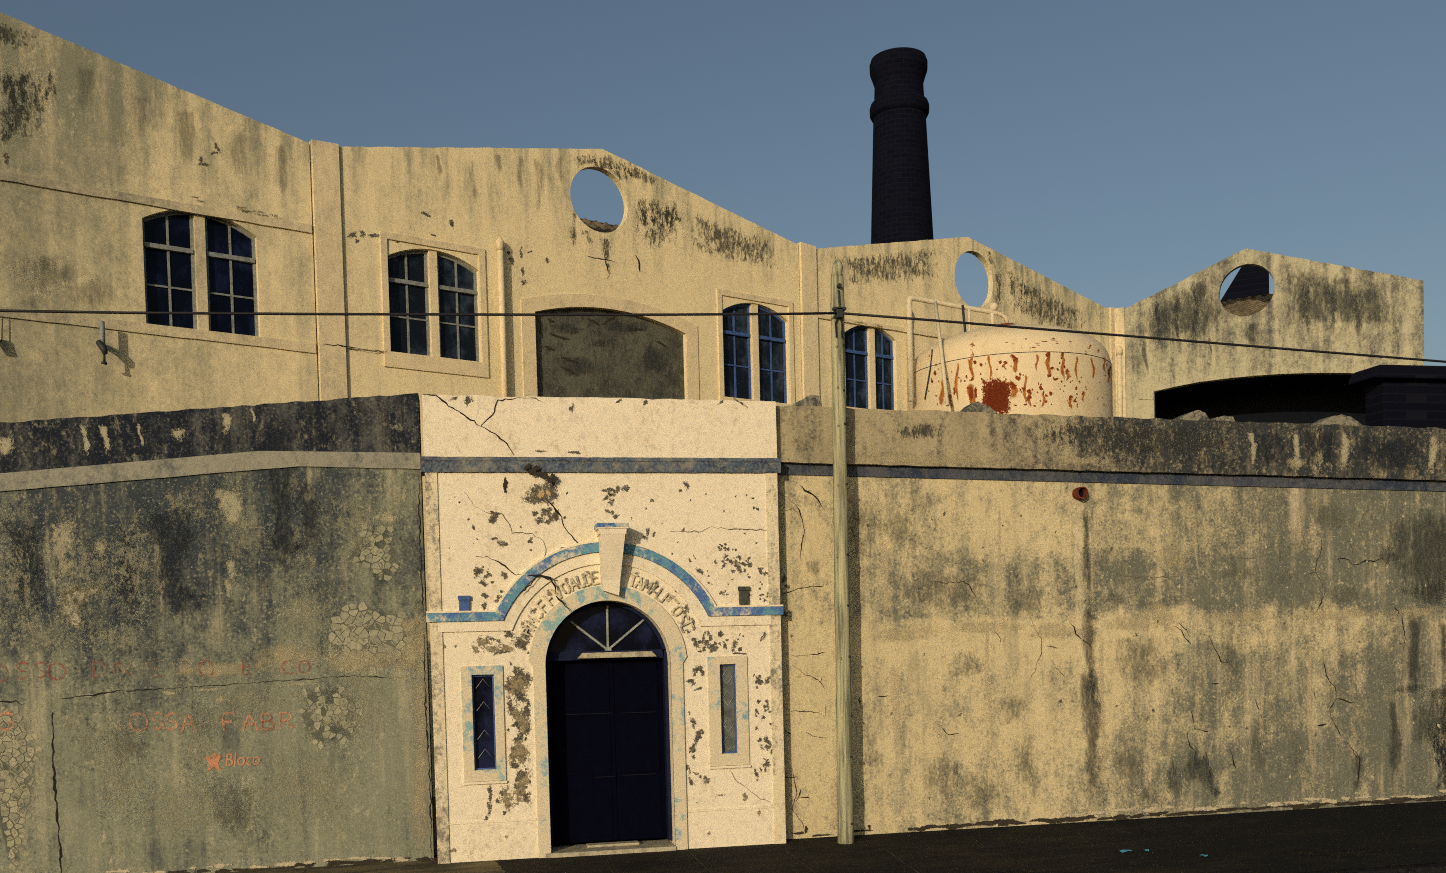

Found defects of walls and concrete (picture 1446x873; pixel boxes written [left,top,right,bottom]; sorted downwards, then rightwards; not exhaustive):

water stain [0,72,56,141]
water stain [577,155,772,268]
water stain [849,249,937,284]
crack [325,344,388,352]
rust [928,338,1111,414]
crack [423,394,540,455]
water stain [0,409,385,667]
peeling [467,510,508,547]
spalling [503,450,568,551]
crack [1305,539,1382,618]
peeling [443,608,536,820]
crack [1314,662,1360,785]